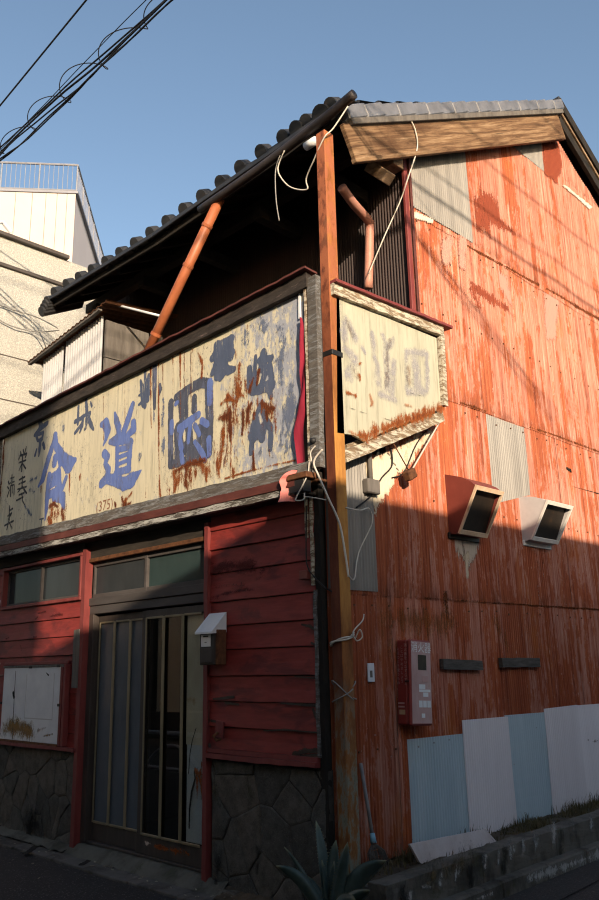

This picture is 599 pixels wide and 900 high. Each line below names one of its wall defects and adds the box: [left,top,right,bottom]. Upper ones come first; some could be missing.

corrosion [150,349,203,452]
corrosion [159,337,295,497]
peeling [241,315,297,462]
corrosion [350,402,444,443]
corrosion [46,473,81,525]
corrosion [3,719,53,739]